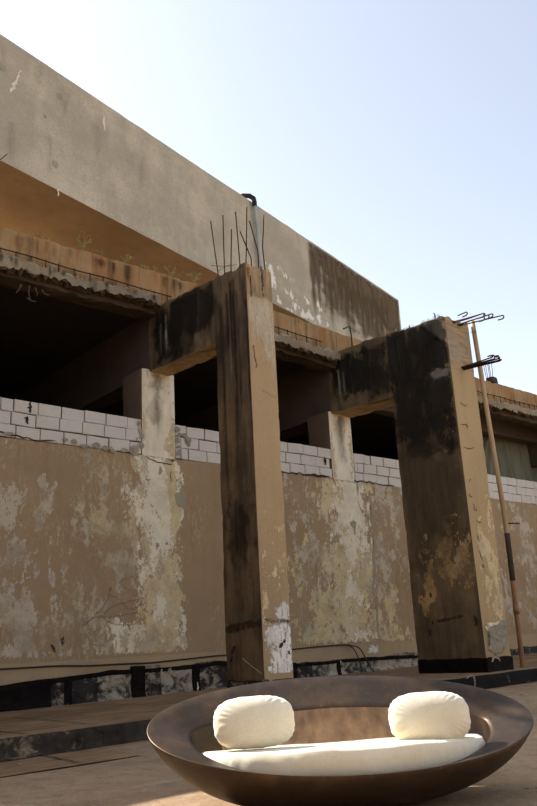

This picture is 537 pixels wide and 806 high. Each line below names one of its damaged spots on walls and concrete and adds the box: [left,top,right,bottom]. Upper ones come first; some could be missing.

spalling [0,247,172,301]
leakage [154,284,237,371]
leakage [246,301,272,404]
spalling [210,207,329,327]
leakage [309,243,460,550]
peeling [0,419,191,660]
peeling [259,432,537,655]